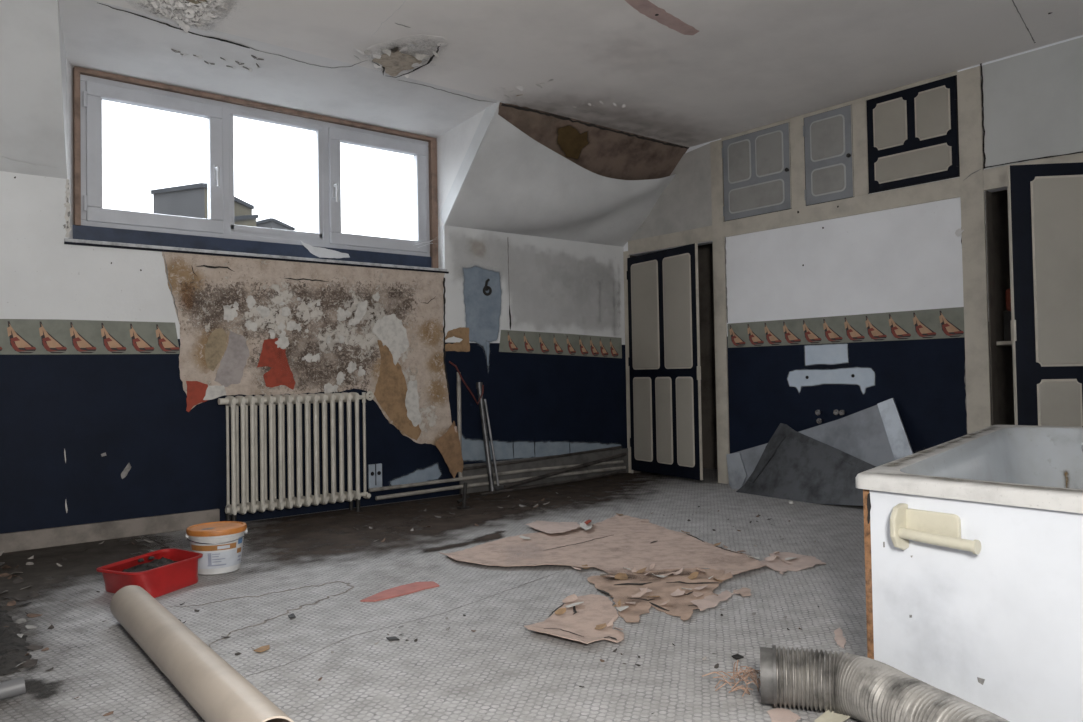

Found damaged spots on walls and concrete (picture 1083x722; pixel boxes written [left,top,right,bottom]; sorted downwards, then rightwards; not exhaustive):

crack [99,3,367,68]
spalling [353,23,448,78]
crack [400,80,497,103]
peeling [205,295,321,371]
peeling [203,385,226,400]
peeling [302,292,422,441]
peeling [390,464,441,486]